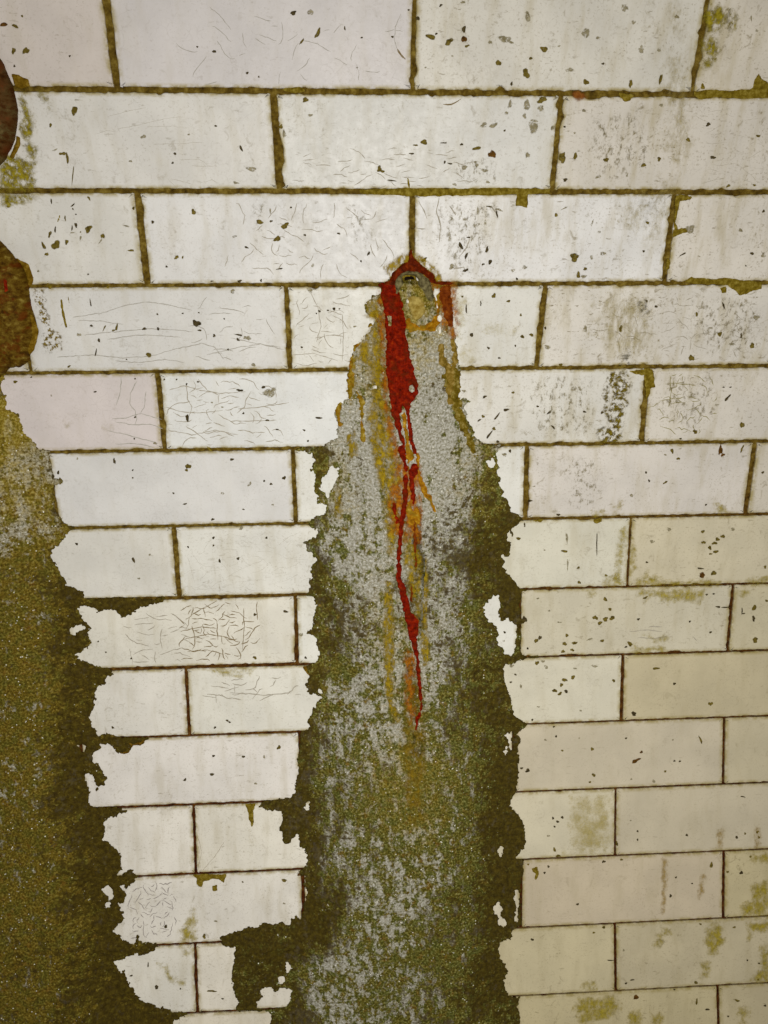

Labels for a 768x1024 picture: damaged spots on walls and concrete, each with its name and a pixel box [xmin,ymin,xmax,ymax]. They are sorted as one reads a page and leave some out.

damp [0,374,187,1024]
damp [220,251,539,1024]
rust [335,249,479,821]